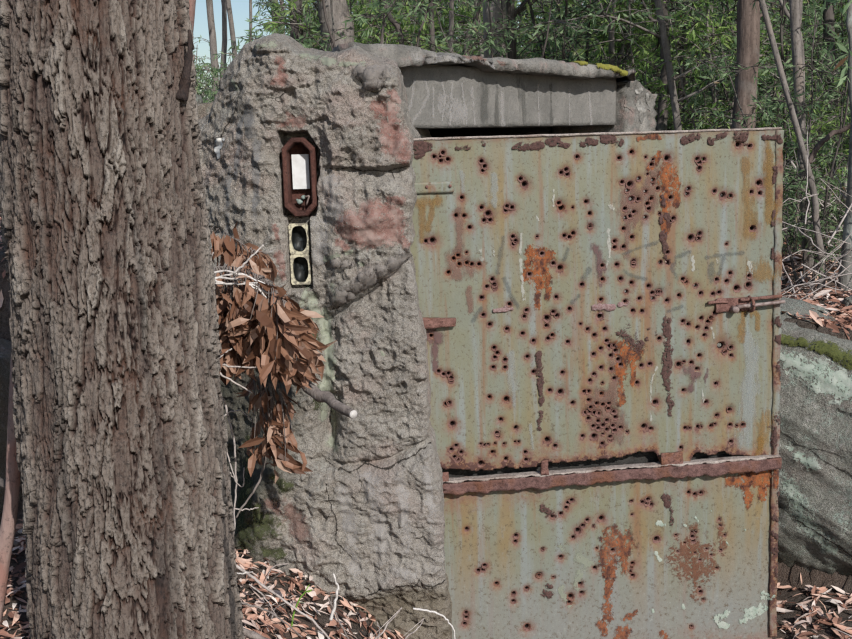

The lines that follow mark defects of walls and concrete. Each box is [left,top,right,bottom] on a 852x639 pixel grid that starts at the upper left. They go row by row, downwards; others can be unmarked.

corrosion [413,141,433,160]
corrosion [512,137,570,151]
corrosion [580,135,624,147]
corrosion [637,133,662,142]
corrosion [621,150,681,264]
corrosion [762,134,784,227]
corrosion [520,244,556,310]
corrosion [588,316,676,440]
crack [321,442,431,561]
corrosion [661,493,674,526]
corrosion [596,525,638,639]
corrosion [666,522,727,601]